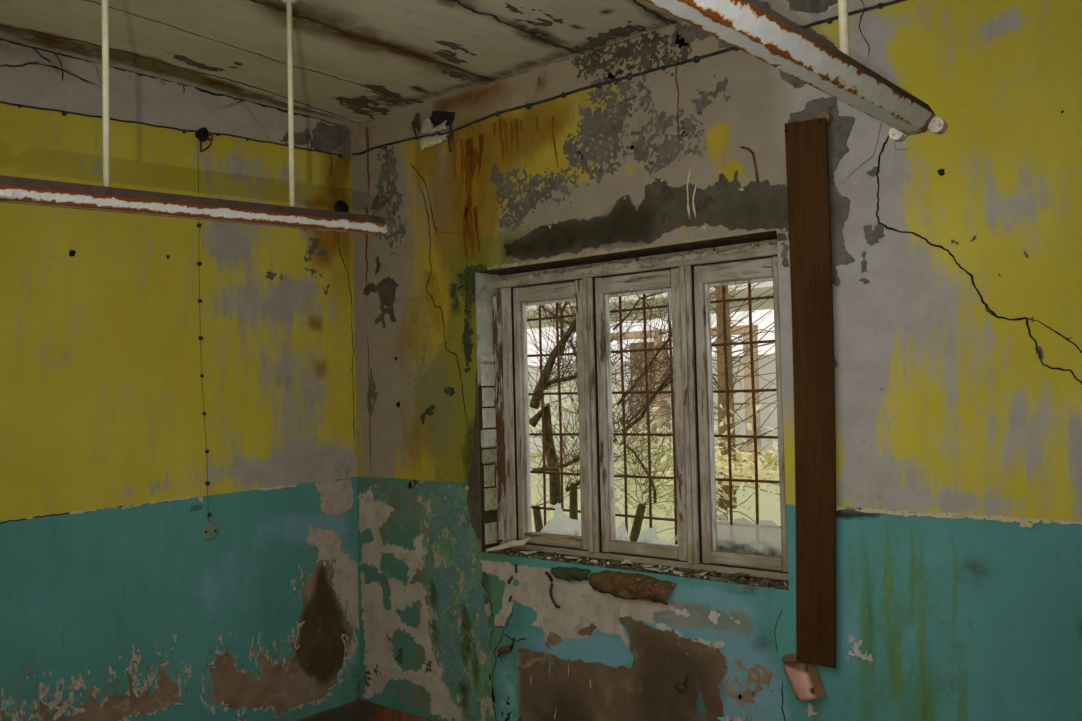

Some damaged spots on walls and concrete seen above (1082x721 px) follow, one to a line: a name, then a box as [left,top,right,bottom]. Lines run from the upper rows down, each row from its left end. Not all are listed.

spalling [778,69,806,89]
spalling [786,0,838,49]
water stain [449,263,487,373]
rust [451,119,522,254]
spalling [486,23,789,286]
spalling [788,97,885,287]
crack [850,122,1082,385]
peeling [0,368,779,721]
water stain [298,568,349,681]